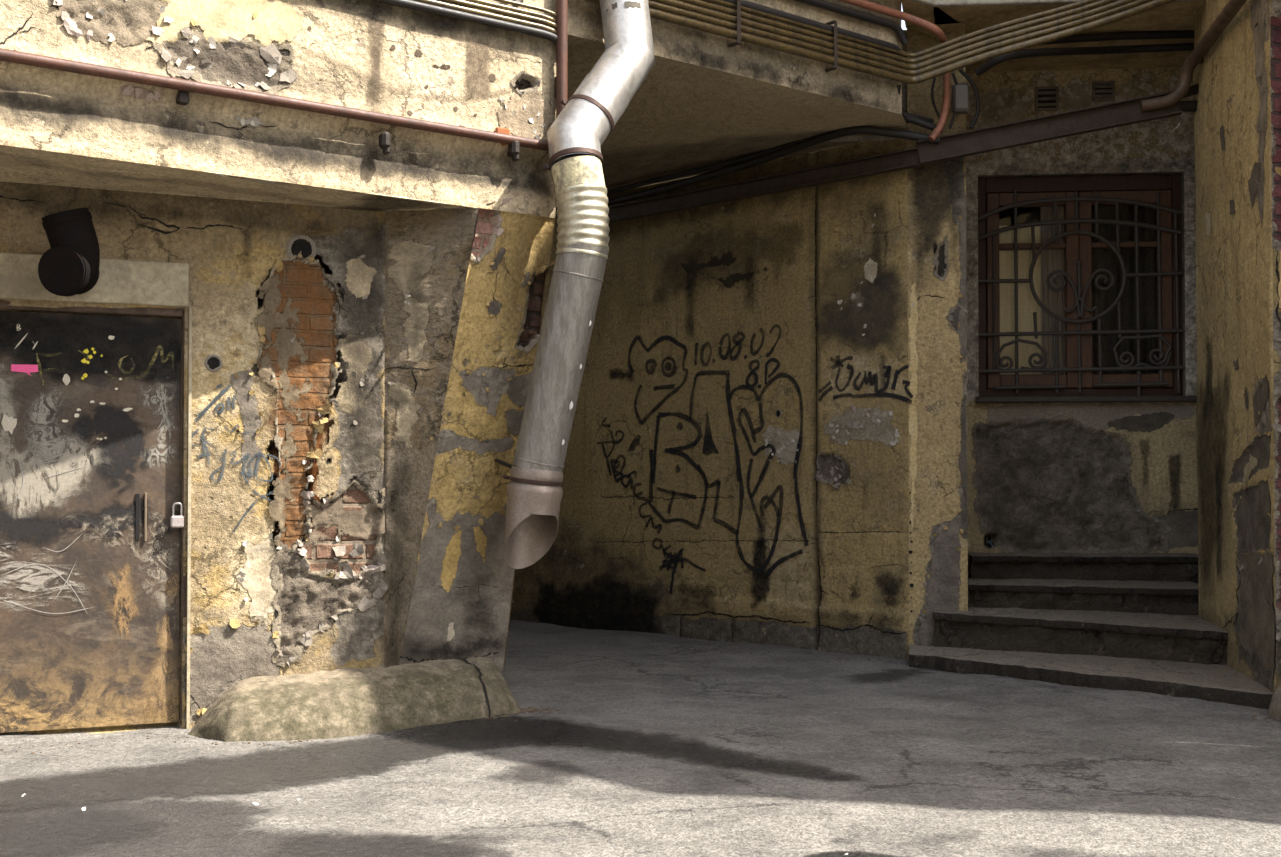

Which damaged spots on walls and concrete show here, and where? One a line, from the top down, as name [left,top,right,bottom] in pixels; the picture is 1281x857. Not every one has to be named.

crack [0,5,59,44]
spalling [53,0,312,95]
spalling [1246,0,1281,251]
spalling [470,198,514,273]
peeling [486,297,504,317]
spalling [515,261,555,353]
crack [1273,251,1281,343]
peeling [429,371,532,455]
spalling [183,255,388,721]
spalling [918,407,1198,646]
peeling [1228,375,1281,679]